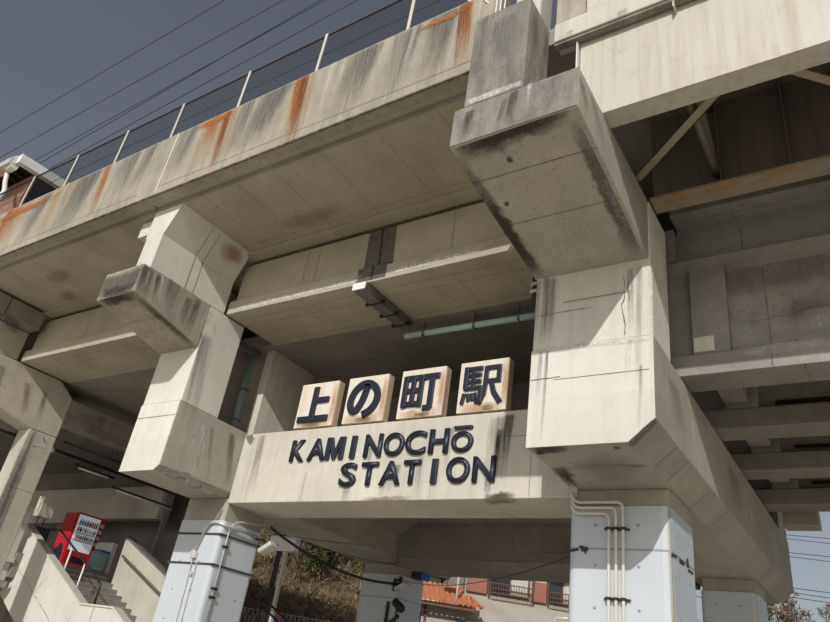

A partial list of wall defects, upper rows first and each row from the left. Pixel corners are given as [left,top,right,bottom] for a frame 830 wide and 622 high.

rust [424,2,470,39]
rust [292,76,310,123]
rust [201,112,234,149]
water stain [472,116,550,150]
water stain [587,154,632,237]
rust [0,198,48,232]
water stain [471,182,533,267]
water stain [488,493,509,502]